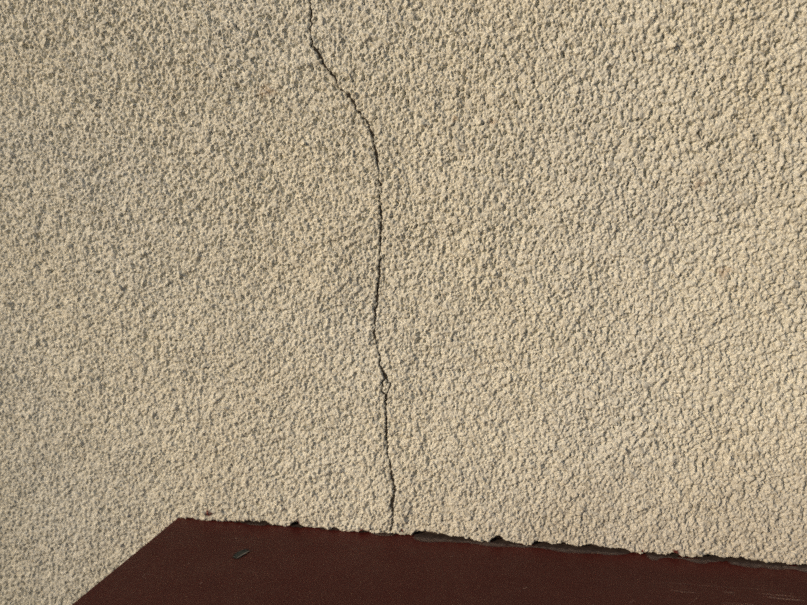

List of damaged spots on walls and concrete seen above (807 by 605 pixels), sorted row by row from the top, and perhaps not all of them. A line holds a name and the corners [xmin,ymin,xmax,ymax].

crack [309,0,396,531]